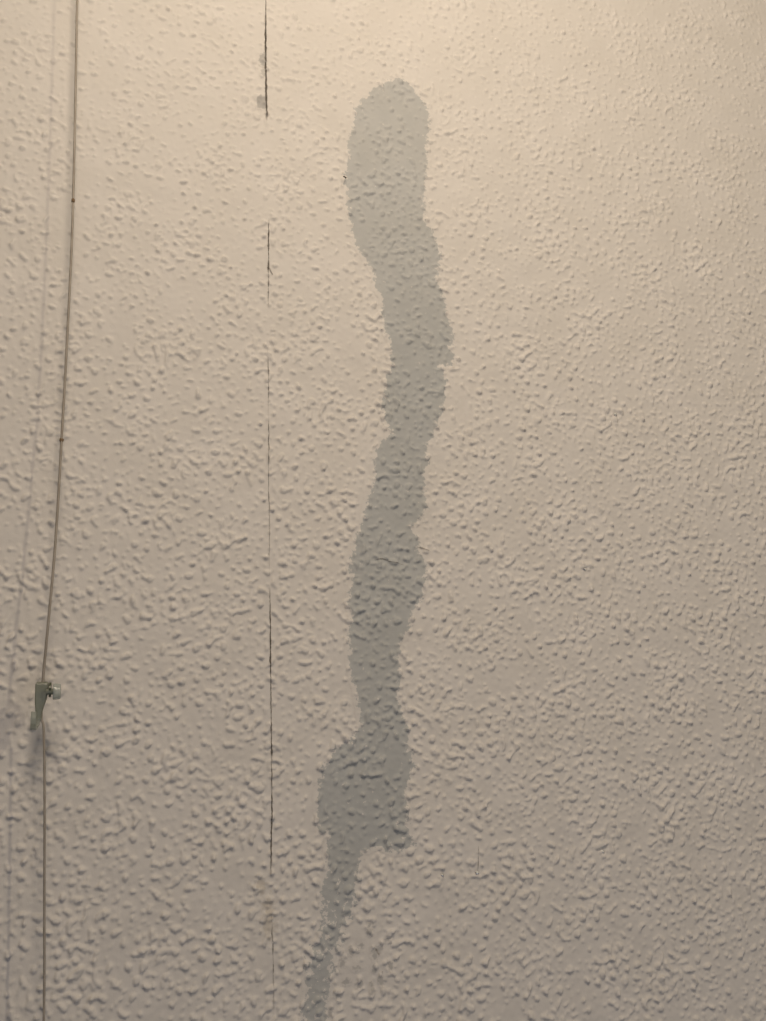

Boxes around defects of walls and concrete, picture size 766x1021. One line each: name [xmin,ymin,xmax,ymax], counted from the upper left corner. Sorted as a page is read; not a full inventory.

crack [255,5,269,115]
crack [264,224,272,296]
damp [298,73,460,1021]
crack [267,604,275,863]